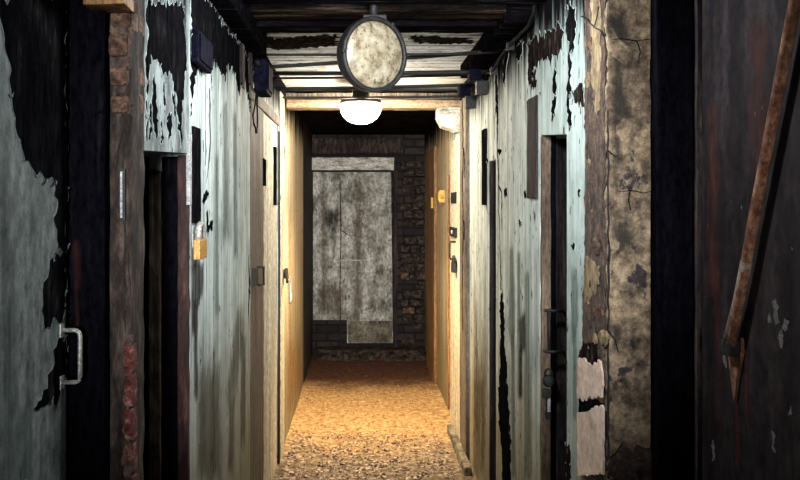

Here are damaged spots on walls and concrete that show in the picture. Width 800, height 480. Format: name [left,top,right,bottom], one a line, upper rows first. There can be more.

peeling [0,0,71,412]
peeling [109,0,254,148]
spalling [502,0,610,364]
spalling [578,397,604,412]
crack [606,110,651,479]
peeling [768,298,789,348]